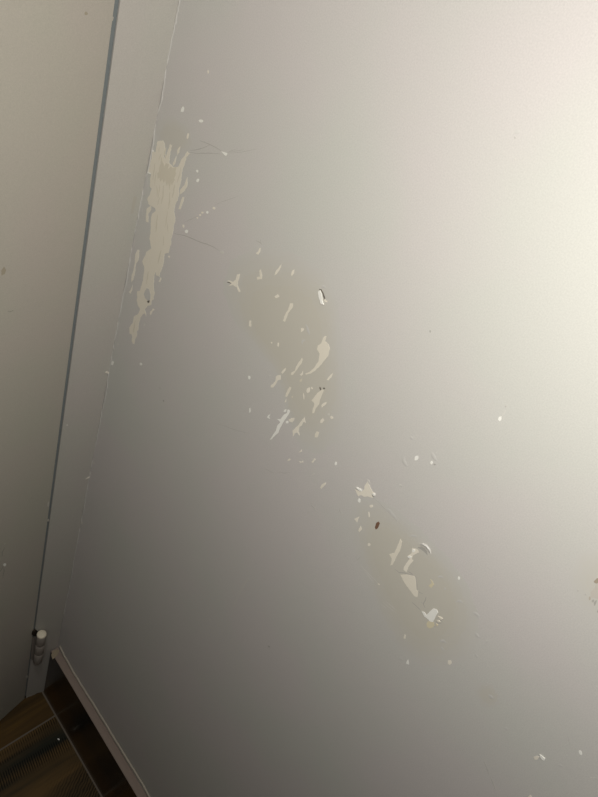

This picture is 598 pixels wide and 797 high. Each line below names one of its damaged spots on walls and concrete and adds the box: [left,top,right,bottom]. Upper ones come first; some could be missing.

peeling [129,141,199,344]
peeling [267,336,333,440]
peeling [355,480,375,532]
peeling [389,539,419,597]
peeling [422,608,443,628]